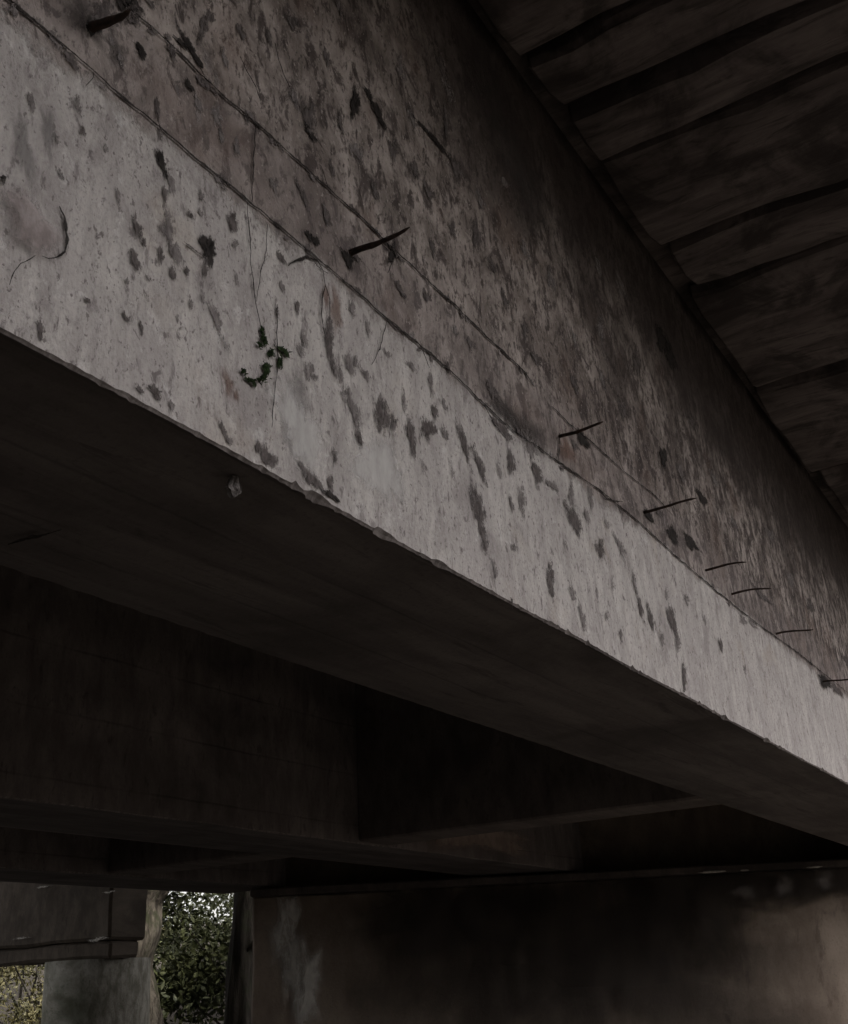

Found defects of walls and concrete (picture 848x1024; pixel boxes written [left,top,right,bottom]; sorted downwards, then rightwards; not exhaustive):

crack [6,0,845,691]
water stain [279,381,320,468]
water stain [456,403,558,555]
spalling [0,317,848,785]
water stain [547,562,557,602]
water stain [569,581,587,632]
water stain [632,571,687,692]